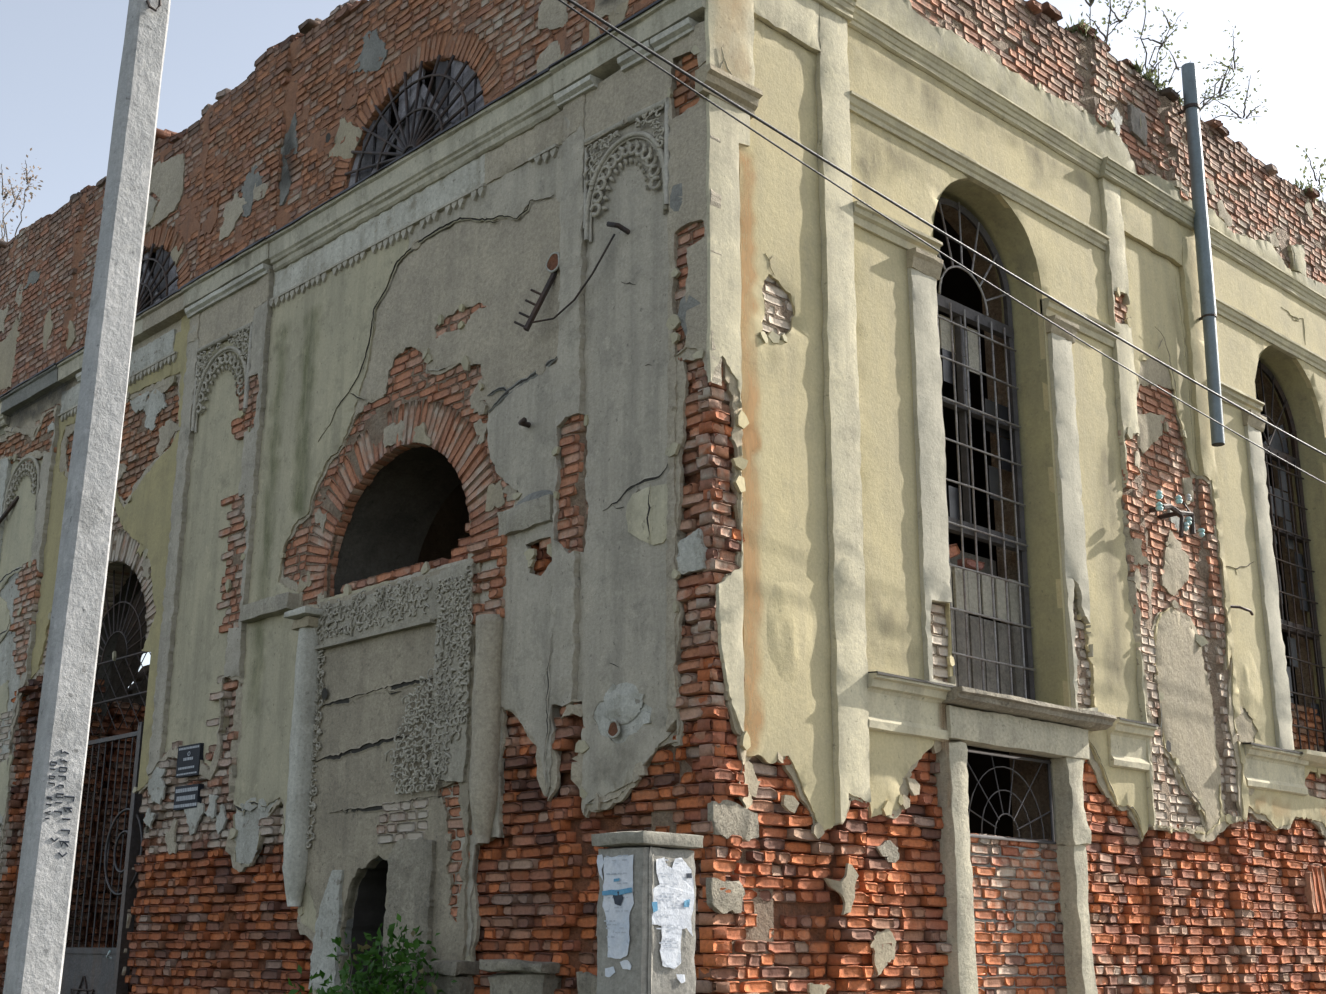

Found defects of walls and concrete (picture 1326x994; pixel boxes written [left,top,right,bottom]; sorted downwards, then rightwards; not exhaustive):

spalling [144,0,657,289]
spalling [0,559,51,994]
spalling [0,184,105,396]
spalling [101,374,182,639]
spalling [122,675,316,994]
crack [315,735,410,763]
crack [320,678,433,708]
crack [330,795,443,814]
peeling [278,197,561,624]
crack [318,195,557,442]
spalling [439,222,955,994]
spalling [1083,357,1326,994]